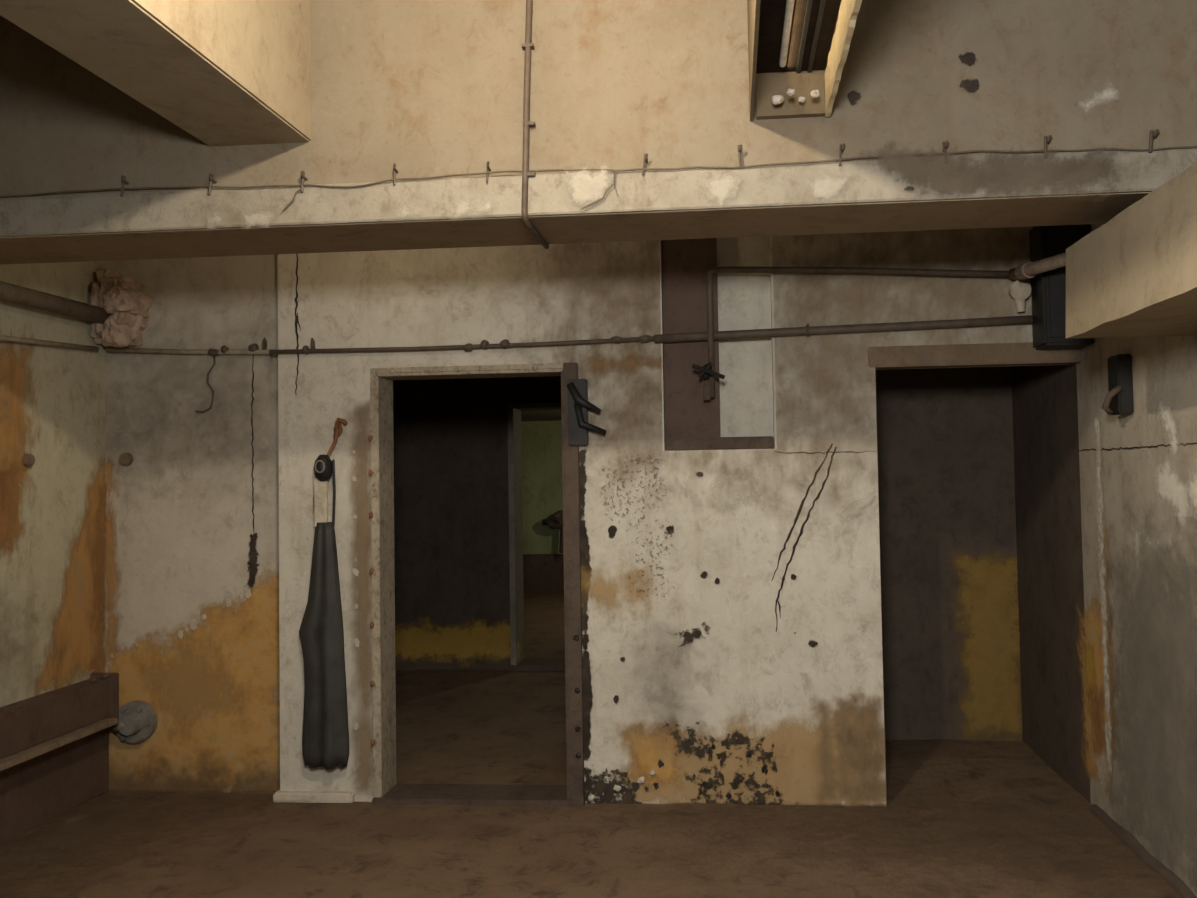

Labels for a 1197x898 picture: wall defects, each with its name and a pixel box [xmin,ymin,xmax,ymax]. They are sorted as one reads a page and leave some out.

peeling [568,168,611,205]
peeling [0,343,32,552]
peeling [107,533,280,794]
spalling [579,450,798,805]
crack [771,444,876,632]
corrosion [1077,536,1115,794]
peeling [1157,402,1197,528]